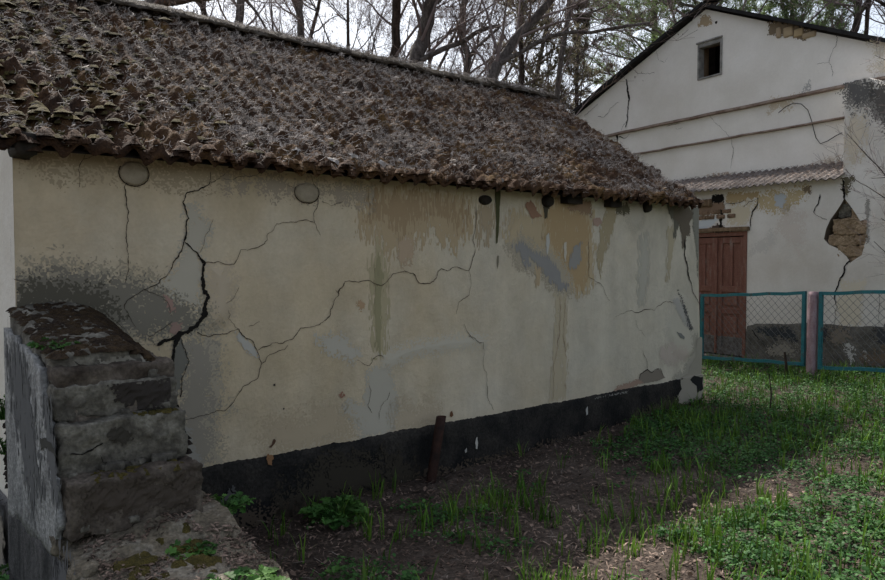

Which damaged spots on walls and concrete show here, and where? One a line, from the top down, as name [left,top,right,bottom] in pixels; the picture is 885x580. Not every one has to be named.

spalling [767,21,817,41]
crack [598,52,663,142]
leakage [804,36,885,169]
leakage [16,244,239,528]
crack [118,166,494,432]
leakage [596,202,630,278]
crack [589,277,672,378]
spalling [586,290,704,415]
crack [684,239,702,309]
spalling [673,190,760,276]
crack [834,261,850,325]
spalling [824,175,871,263]